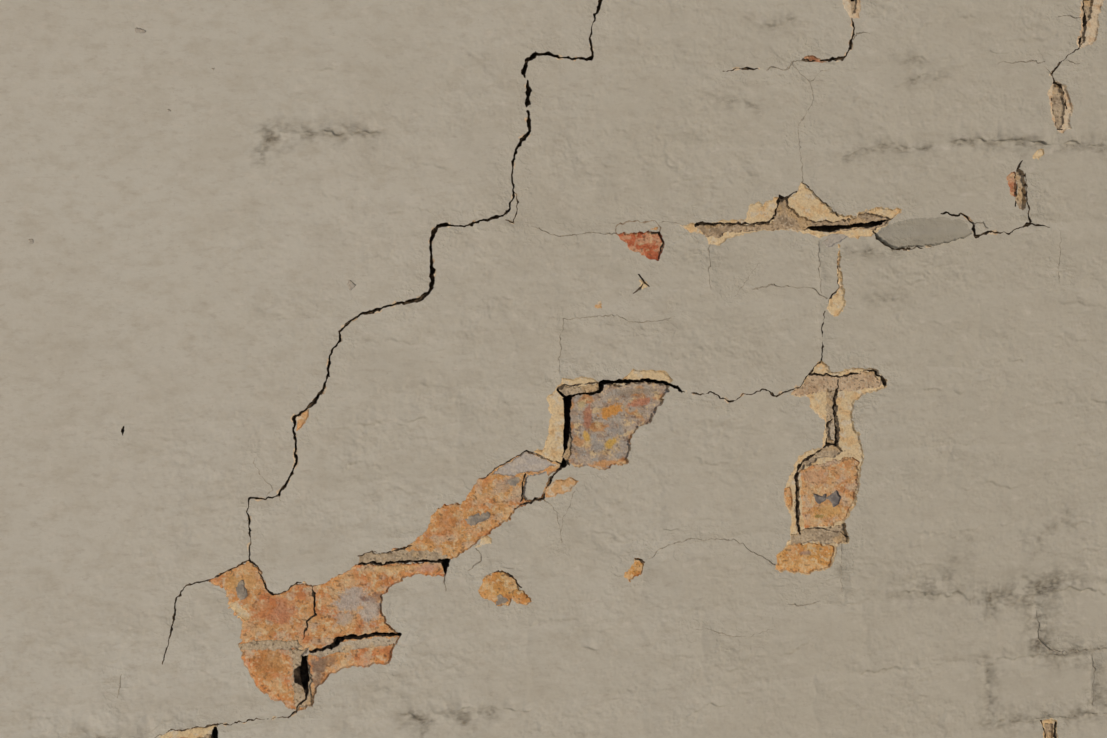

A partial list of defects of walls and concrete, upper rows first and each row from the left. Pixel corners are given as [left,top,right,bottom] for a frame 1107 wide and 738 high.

crack [723,19,868,183]
spalling [1047,81,1074,133]
crack [246,0,616,561]
spalling [615,220,665,261]
crack [680,241,828,403]
spalling [680,183,902,317]
crack [872,231,931,251]
crack [941,211,1061,284]
spalling [1006,149,1045,223]
spalling [775,361,888,575]
spalling [207,369,682,713]
crack [162,579,209,664]